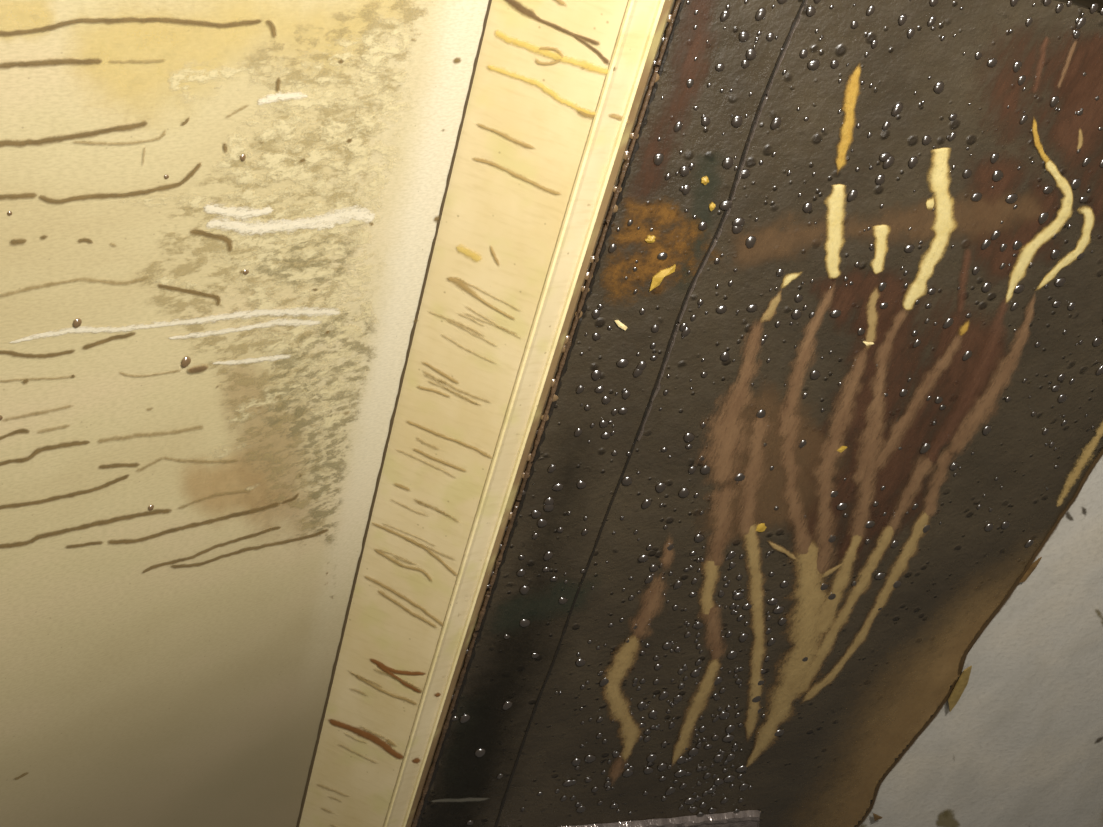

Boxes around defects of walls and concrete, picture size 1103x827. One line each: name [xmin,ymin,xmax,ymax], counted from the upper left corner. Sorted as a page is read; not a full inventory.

crack [0,17,276,37]
water stain [496,0,615,74]
crack [0,118,189,162]
water stain [836,66,861,170]
rust [993,35,1103,221]
rust [729,160,1057,558]
crack [0,406,235,509]
water stain [672,119,1094,767]
peeling [1057,422,1103,507]
crack [0,490,328,573]
peeling [1019,557,1042,583]
peeling [948,666,972,712]